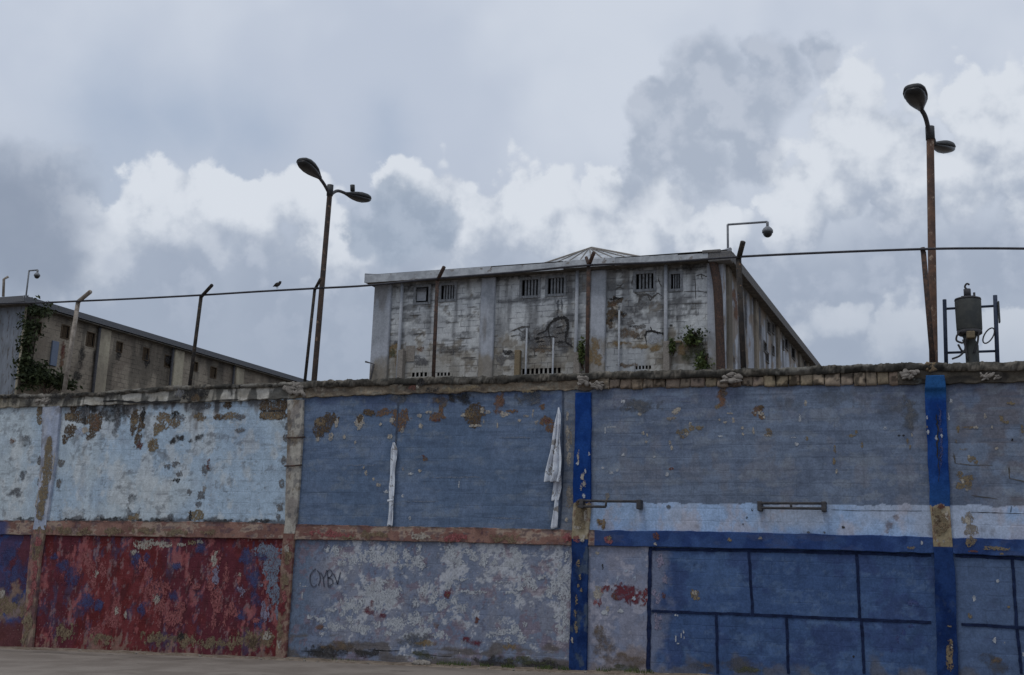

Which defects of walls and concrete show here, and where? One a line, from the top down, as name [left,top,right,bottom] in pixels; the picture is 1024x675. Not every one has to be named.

damp [612,293,661,352]
peeling [128,388,246,452]
peeling [259,399,287,430]
peeling [312,378,480,444]
peeling [0,406,292,651]
peeling [305,402,624,645]
peeling [932,504,1010,555]